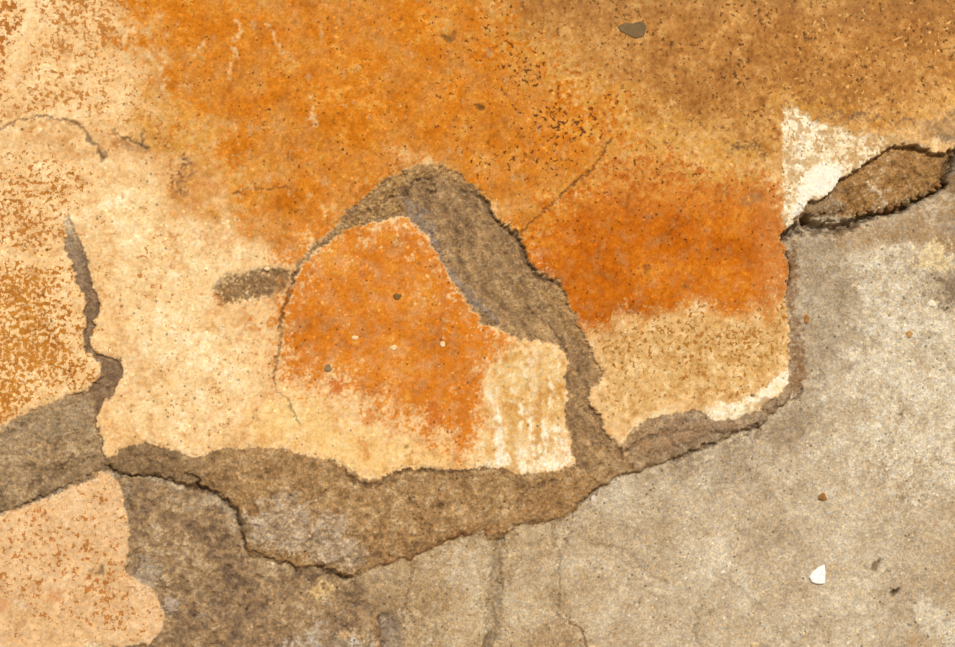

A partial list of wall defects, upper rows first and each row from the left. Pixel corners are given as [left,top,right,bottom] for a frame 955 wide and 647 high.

crack [0,111,155,169]
corrosion [0,0,809,471]
crack [344,132,617,291]
crack [775,145,955,291]
peeling [778,99,955,224]
peeling [0,160,290,504]
peeling [242,390,444,479]
spalling [299,164,689,469]
crack [542,316,574,357]
peeling [702,366,789,422]
spalling [83,478,372,647]
crack [473,528,519,647]